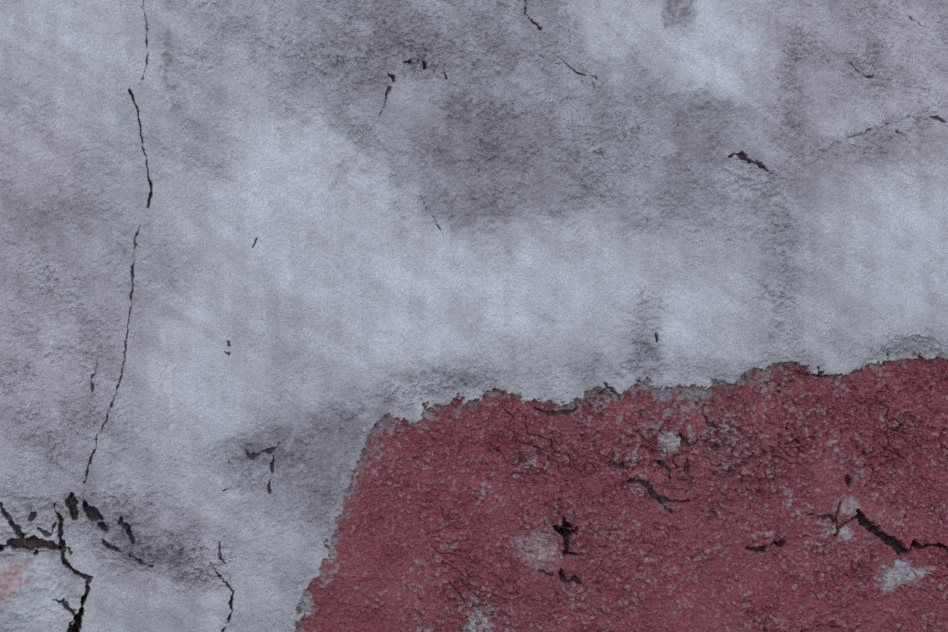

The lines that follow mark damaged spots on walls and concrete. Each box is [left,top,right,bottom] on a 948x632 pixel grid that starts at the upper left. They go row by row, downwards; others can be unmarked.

crack [379,85,392,117]
crack [803,115,948,157]
crack [82,0,154,485]
spalling [369,366,514,422]
peeling [655,426,681,458]
crack [52,502,94,632]
crack [209,541,235,632]
peeling [509,526,567,579]
peeling [830,494,864,544]
crack [805,500,948,556]
peeling [871,556,938,598]
peeling [450,597,501,632]